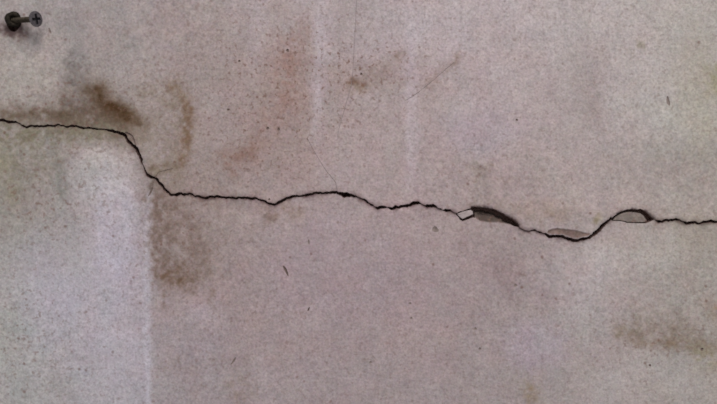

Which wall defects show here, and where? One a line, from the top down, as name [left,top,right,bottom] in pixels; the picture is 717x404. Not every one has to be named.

damp [0,42,238,313]
crack [0,118,455,213]
flaking render [455,207,519,227]
crack [519,209,717,242]